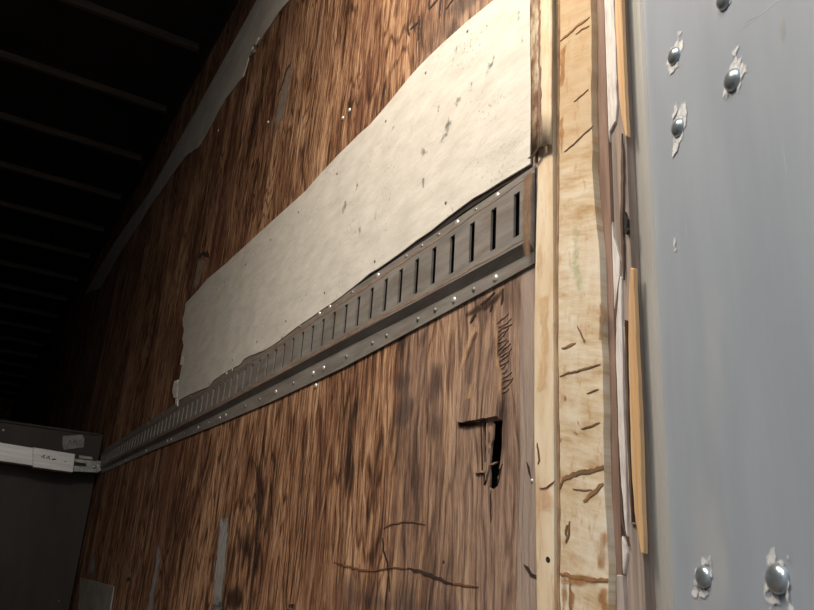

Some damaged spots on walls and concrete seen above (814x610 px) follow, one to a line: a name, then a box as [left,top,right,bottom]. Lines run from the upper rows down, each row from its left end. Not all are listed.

peeling [723,46,746,96]
peeling [672,103,687,157]
crack [333,521,478,610]
peeling [691,557,712,598]
peeling [767,548,788,566]
peeling [764,581,794,610]